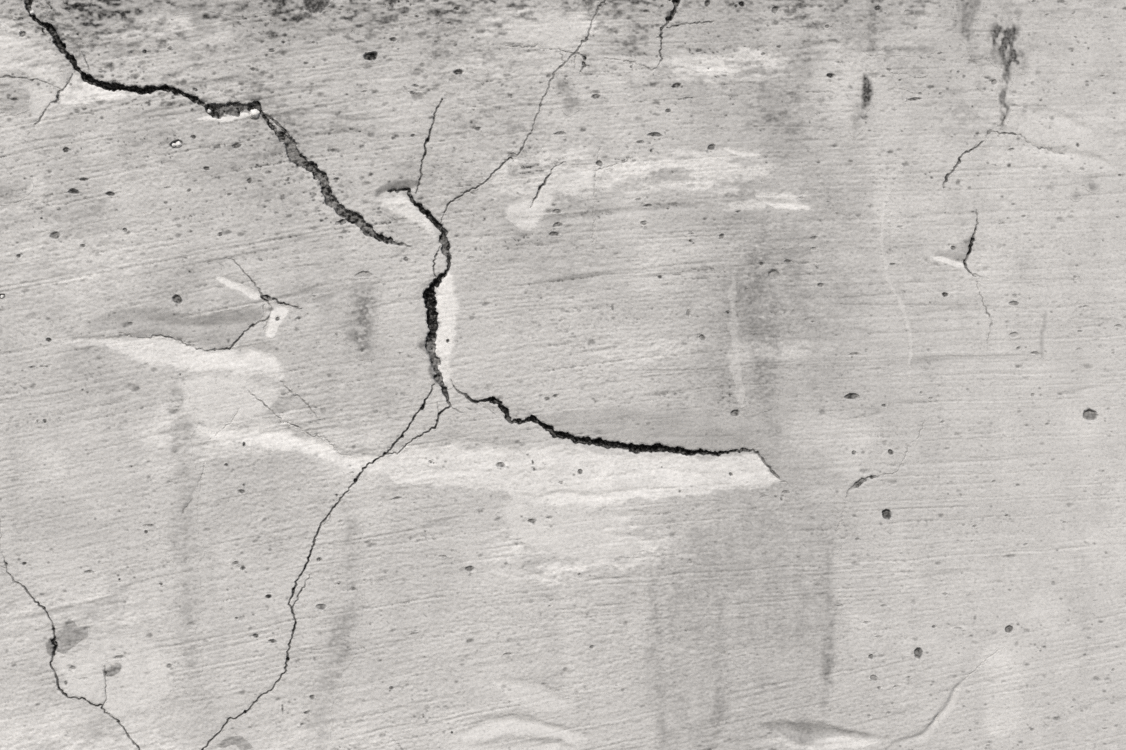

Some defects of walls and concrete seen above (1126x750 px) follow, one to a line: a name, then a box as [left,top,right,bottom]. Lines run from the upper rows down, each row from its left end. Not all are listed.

damp [953,0,1014,129]
crack [941,116,1066,190]
crack [962,208,994,347]
crack [0,0,790,750]